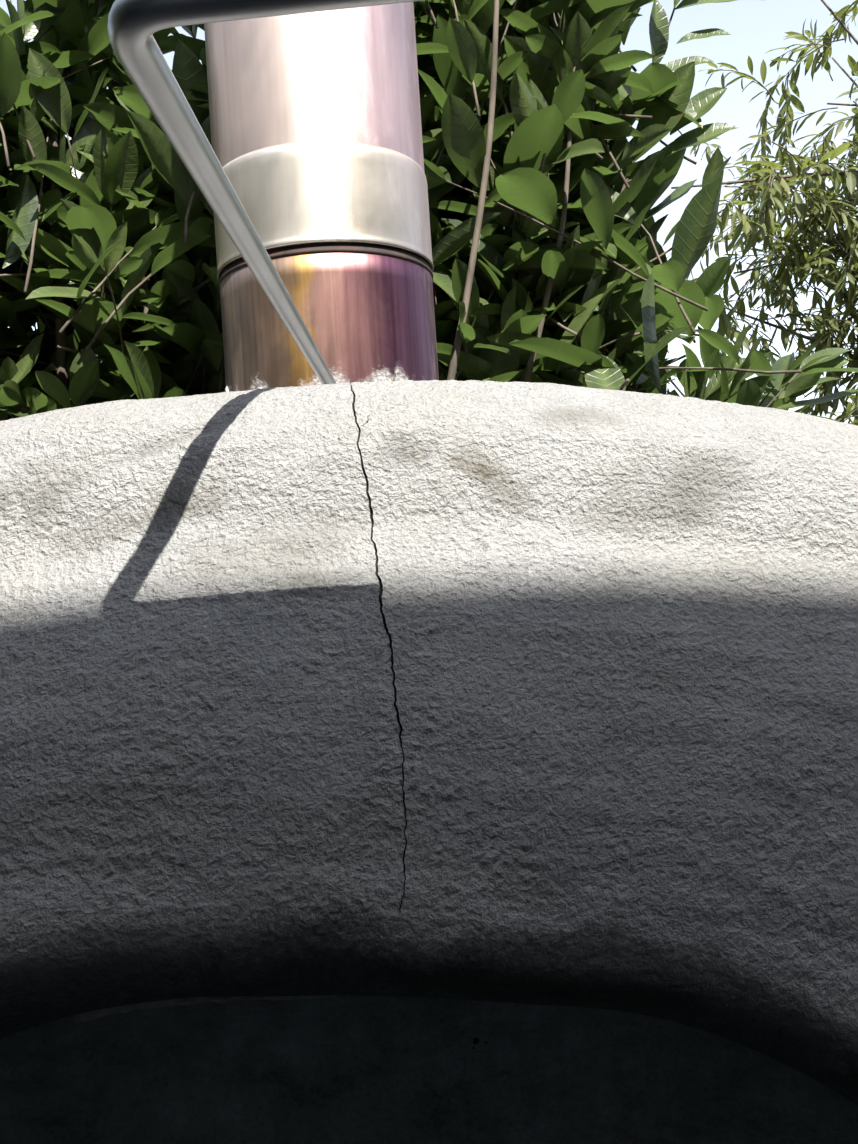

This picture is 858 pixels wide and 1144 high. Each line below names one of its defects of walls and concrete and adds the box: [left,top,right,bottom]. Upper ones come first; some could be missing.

crack [350,382,407,912]